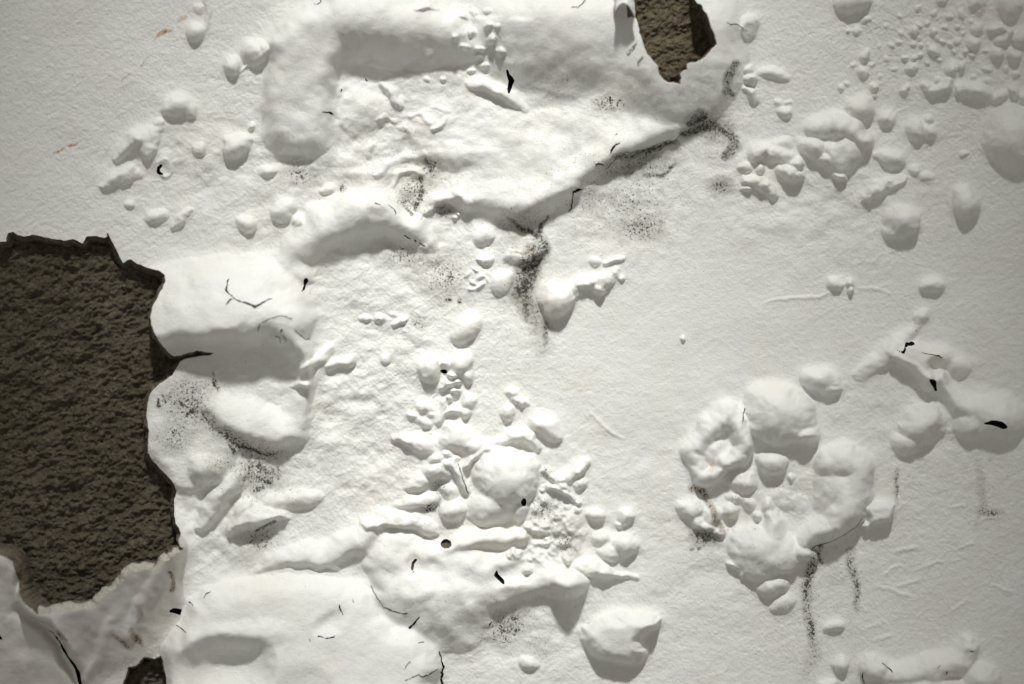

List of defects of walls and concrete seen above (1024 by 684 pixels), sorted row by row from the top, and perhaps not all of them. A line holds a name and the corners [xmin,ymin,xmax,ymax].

spalling [614,0,717,85]
damp [501,211,550,336]
spalling [0,232,242,684]
damp [156,369,284,492]